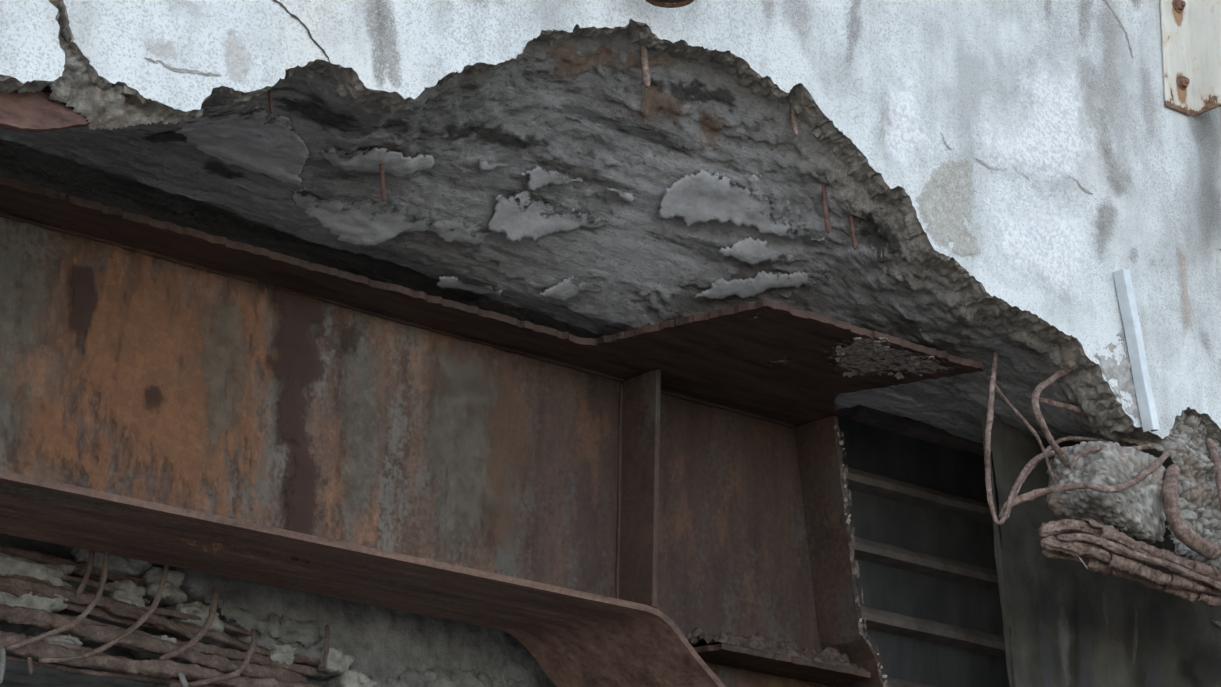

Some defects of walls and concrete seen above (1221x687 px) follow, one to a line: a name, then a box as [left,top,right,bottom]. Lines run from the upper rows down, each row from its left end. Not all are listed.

crack [273,0,332,65]
leakage [368,0,400,86]
leakage [848,0,861,59]
spalling [176,30,1221,626]
rust [145,385,165,409]
rust [257,279,362,535]
spalling [0,544,530,687]